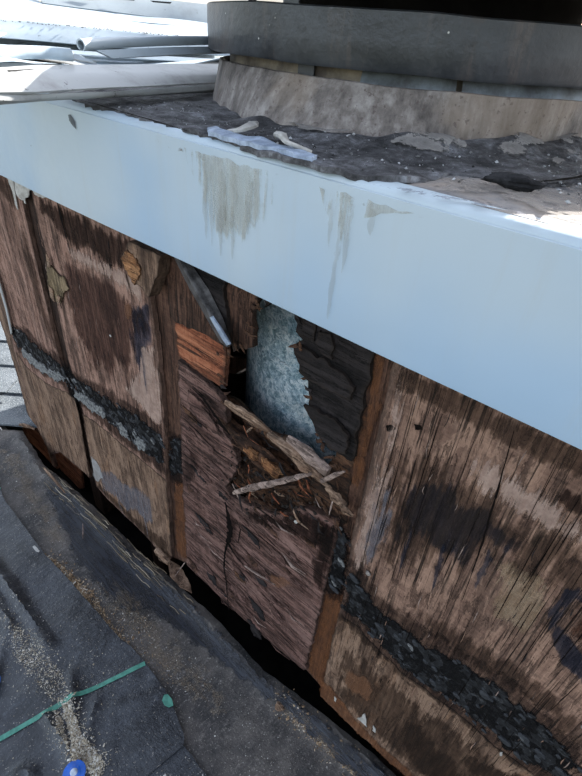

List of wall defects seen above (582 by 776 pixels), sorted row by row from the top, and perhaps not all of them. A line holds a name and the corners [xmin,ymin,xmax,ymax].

leakage [39,199,151,392]
crack [223,502,244,610]
spalling [226,395,322,511]
leakage [558,489,582,516]
leakage [548,589,582,673]